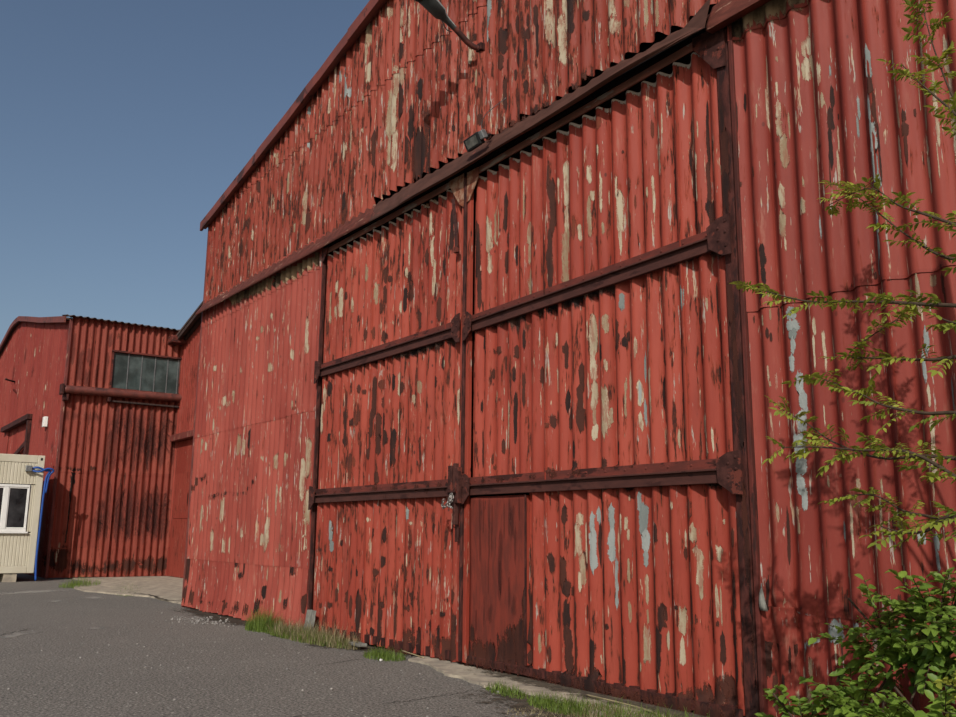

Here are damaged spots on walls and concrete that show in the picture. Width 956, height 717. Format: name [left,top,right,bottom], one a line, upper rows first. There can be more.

peeling [544,0,579,66]
leakage [728,0,808,42]
peeling [385,65,406,172]
peeling [756,55,790,168]
peeling [801,16,831,236]
peeling [556,160,629,282]
peeling [295,386,327,554]
peeling [586,314,652,441]
peeling [762,294,808,534]
corrosion [319,546,738,717]
peeling [574,491,652,673]
peeling [667,606,688,666]